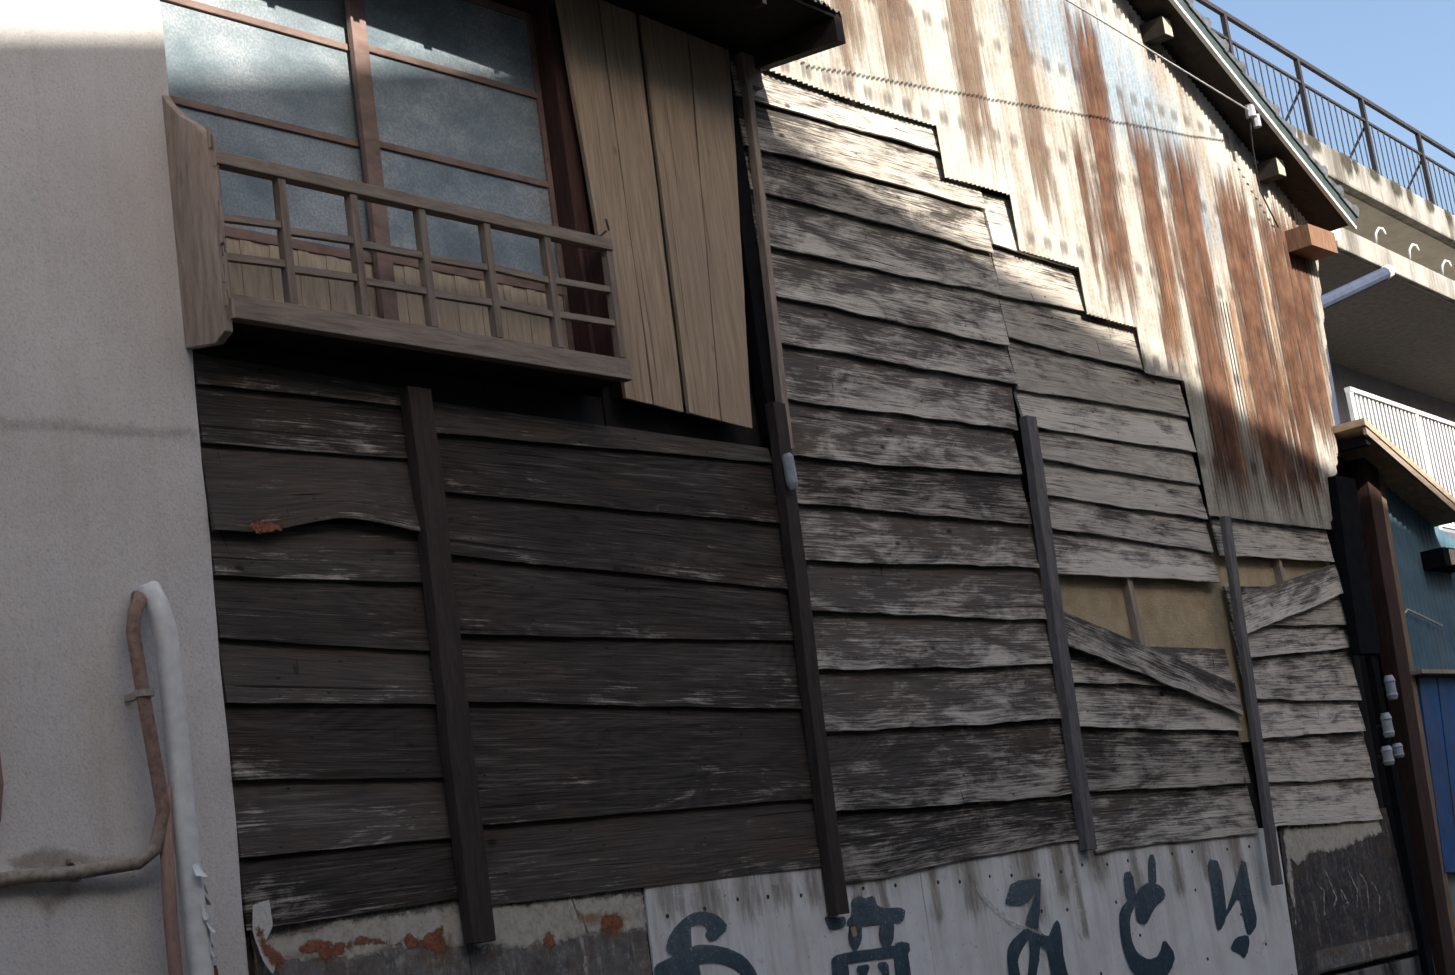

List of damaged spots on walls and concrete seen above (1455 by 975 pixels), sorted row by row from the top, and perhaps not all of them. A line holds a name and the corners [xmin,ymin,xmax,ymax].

corrosion [832,0,923,79]
corrosion [946,0,994,143]
corrosion [1004,0,1050,211]
corrosion [1064,6,1334,514]
corrosion [250,518,283,533]
corrosion [299,927,448,961]
corrosion [578,913,624,935]